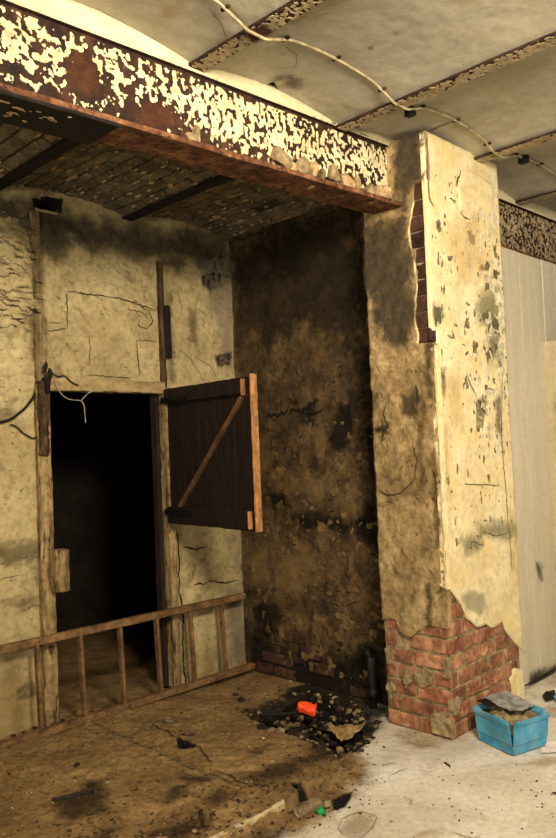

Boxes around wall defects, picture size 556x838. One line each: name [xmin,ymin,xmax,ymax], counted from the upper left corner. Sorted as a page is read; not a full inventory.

corrosion [246,26,273,43]
water stain [235,210,390,482]
spalling [402,183,452,381]
peeling [447,302,509,464]
peeling [437,194,556,297]
water stain [245,597,388,706]
water stain [278,492,378,559]
spalling [255,438,525,740]